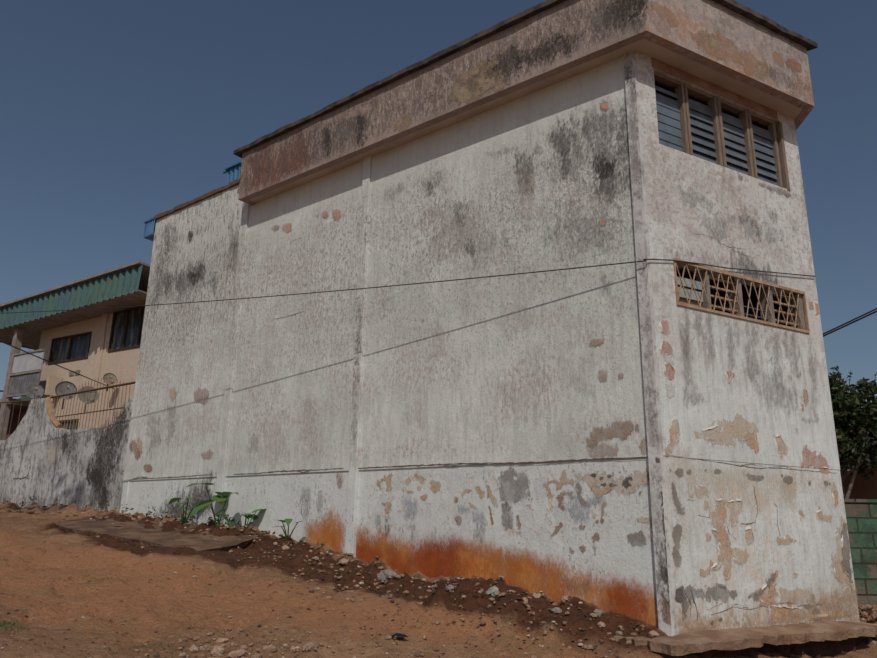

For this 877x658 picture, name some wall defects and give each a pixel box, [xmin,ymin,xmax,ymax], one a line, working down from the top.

leakage [462,0,652,103]
leakage [546,107,631,203]
peeling [659,312,676,398]
leakage [48,405,131,510]
rust [307,512,344,553]
flaking render [454,467,530,529]
rust [356,531,658,626]
peeling [543,470,650,544]
peeling [586,420,648,458]
peeling [660,468,755,625]
crack [661,580,824,621]
peeling [800,446,838,506]